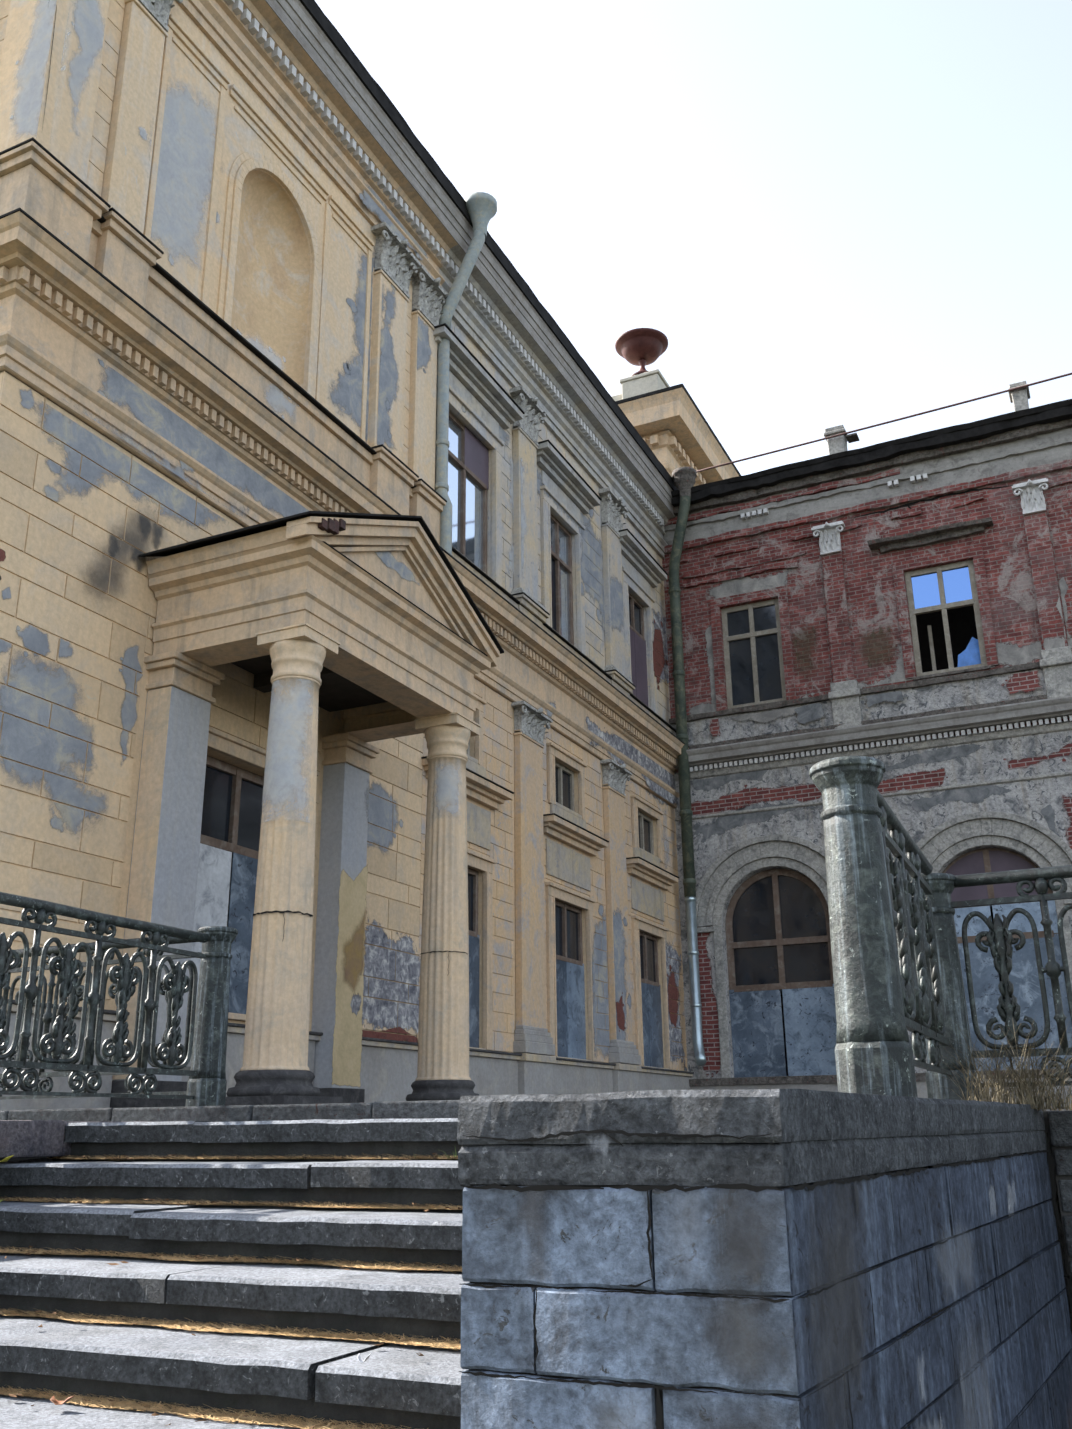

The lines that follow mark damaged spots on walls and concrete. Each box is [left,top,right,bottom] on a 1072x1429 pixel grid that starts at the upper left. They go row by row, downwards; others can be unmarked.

peeling [139,87,219,265]
peeling [237,330,286,369]
peeling [330,253,399,452]
peeling [417,317,431,373]
peeling [20,359,346,537]
peeling [0,549,11,599]
peeling [0,625,106,834]
peeling [366,782,403,852]
flaking render [1041,795,1072,849]
peeling [350,919,421,1043]
flaking render [665,926,721,1077]
crack [655,1387,663,1429]